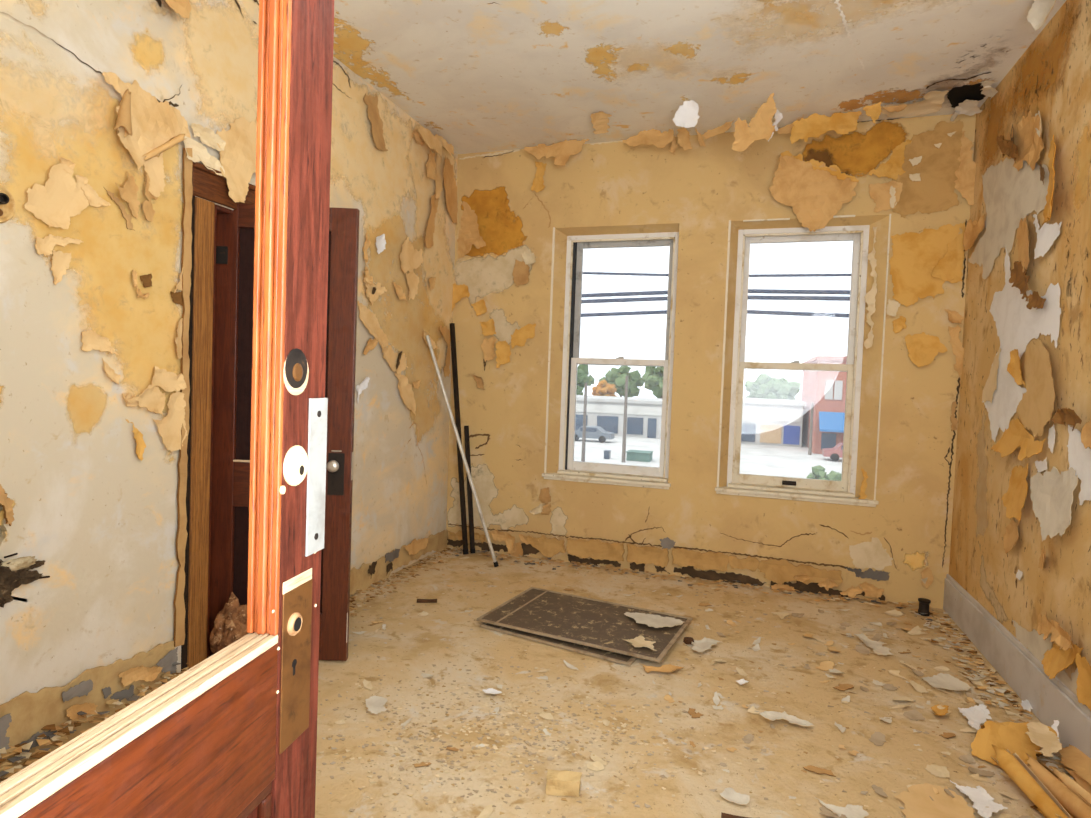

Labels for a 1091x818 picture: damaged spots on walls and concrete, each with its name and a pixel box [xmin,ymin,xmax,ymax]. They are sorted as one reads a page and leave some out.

crack [0,12,102,74]
crack [156,85,182,107]
leakage [540,21,569,36]
leakage [585,44,649,81]
leakage [838,89,924,111]
leakage [984,13,1087,165]
peeling [24,72,257,285]
leakage [802,120,907,177]
peeling [621,72,1091,570]
spalling [350,464,893,601]
spalling [0,553,50,608]
flaking render [0,641,178,778]